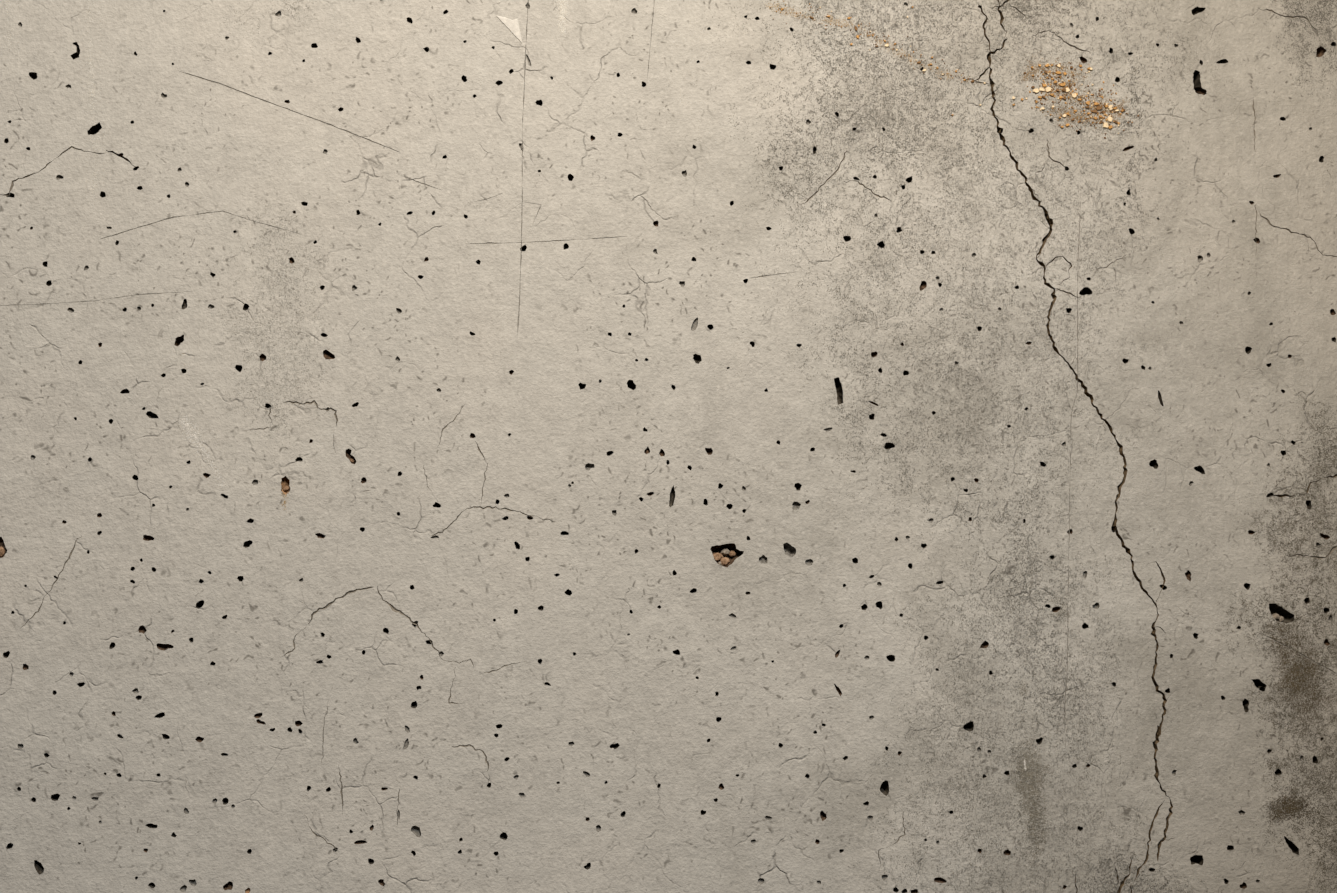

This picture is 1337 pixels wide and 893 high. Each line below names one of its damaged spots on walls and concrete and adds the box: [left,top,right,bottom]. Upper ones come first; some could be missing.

corrosion [1012,48,1139,139]
crack [963,0,1175,893]
crack [878,812,905,864]